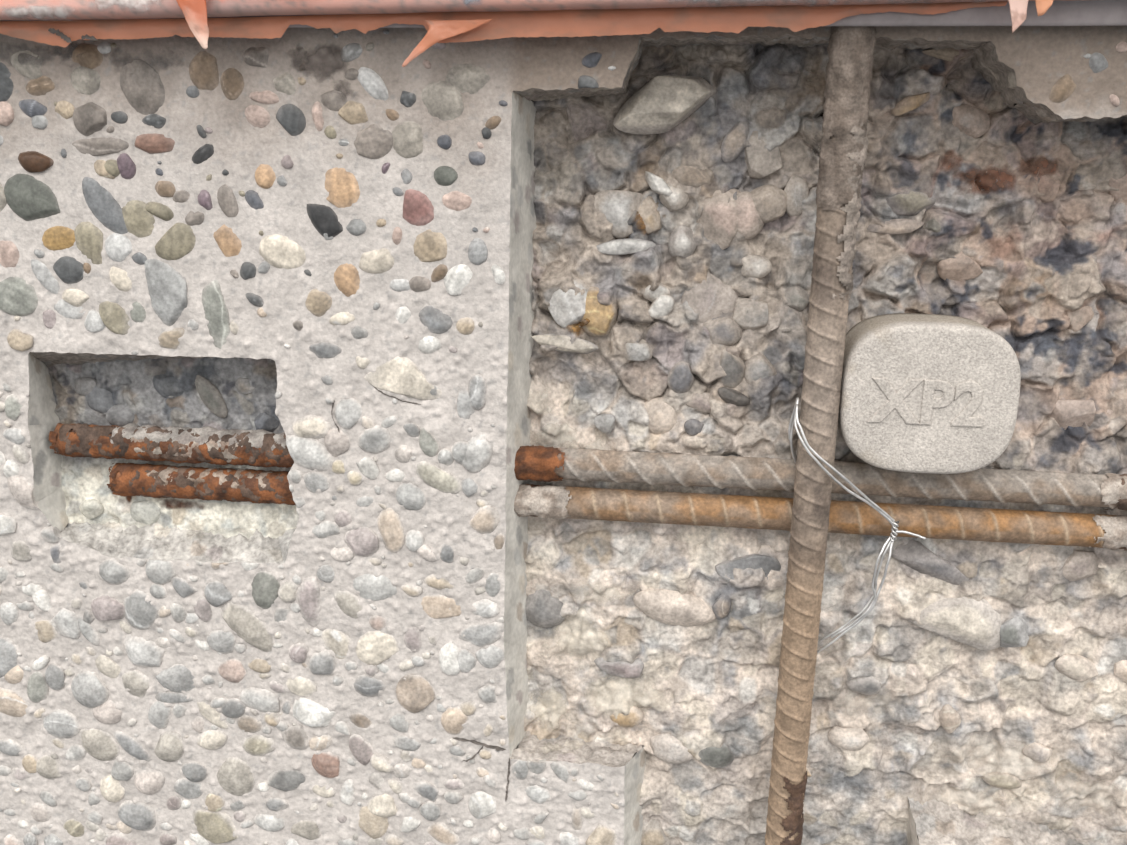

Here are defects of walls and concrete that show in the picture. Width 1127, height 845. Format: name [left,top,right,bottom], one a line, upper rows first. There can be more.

peeling [0,0,1029,67]
peeling [1035,0,1053,16]
spalling [28,352,299,564]
spalling [503,26,1127,845]
rust [164,500,201,508]